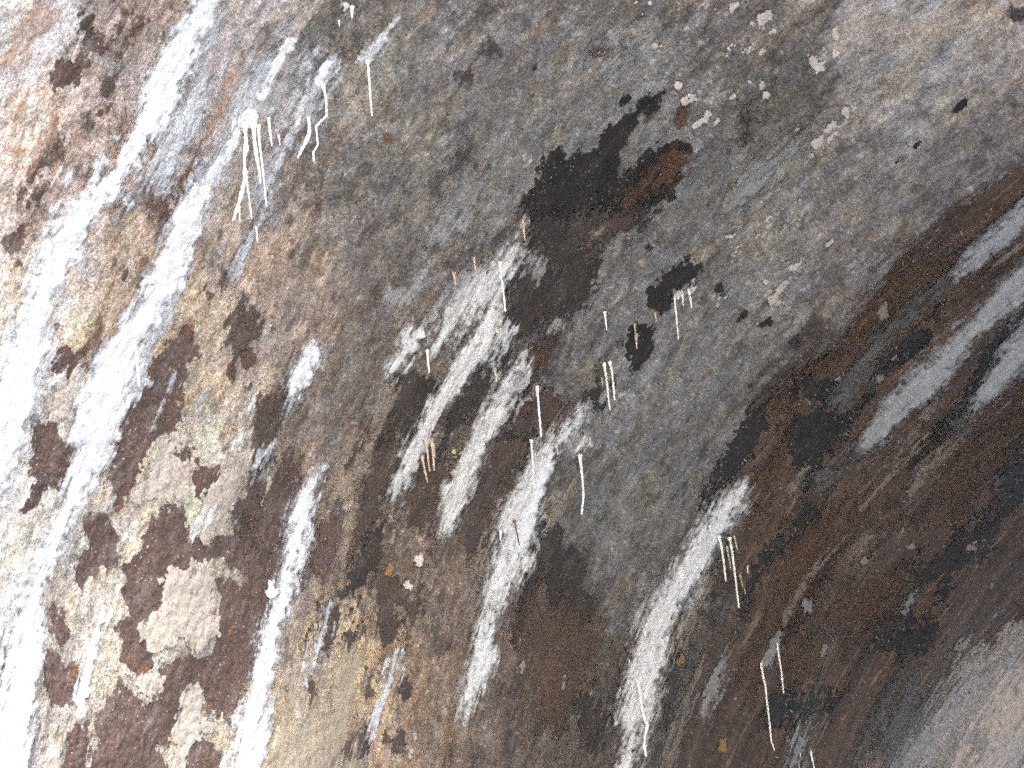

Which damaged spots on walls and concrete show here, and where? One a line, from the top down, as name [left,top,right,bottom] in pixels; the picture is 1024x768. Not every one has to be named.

water stain [0,0,342,768]
water stain [453,66,474,86]
water stain [477,39,503,57]
water stain [303,80,1024,768]